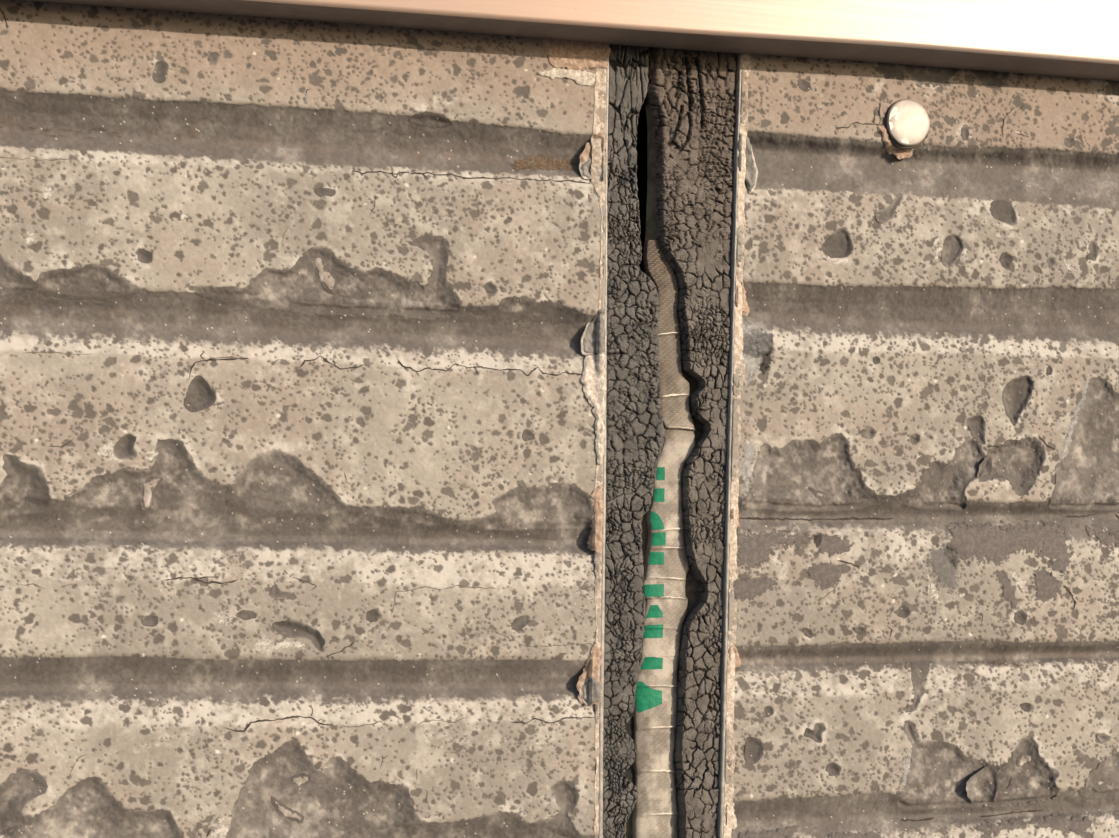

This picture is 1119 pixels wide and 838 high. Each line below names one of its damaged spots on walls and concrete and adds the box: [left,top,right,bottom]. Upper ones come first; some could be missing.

crack [668,59,703,150]
spalling [0,255,143,301]
spalling [138,249,153,264]
spalling [0,434,605,553]
spalling [730,375,1119,527]
spalling [0,769,184,838]
spalling [225,739,579,838]
spalling [898,661,1060,816]
spalling [1079,752,1119,800]